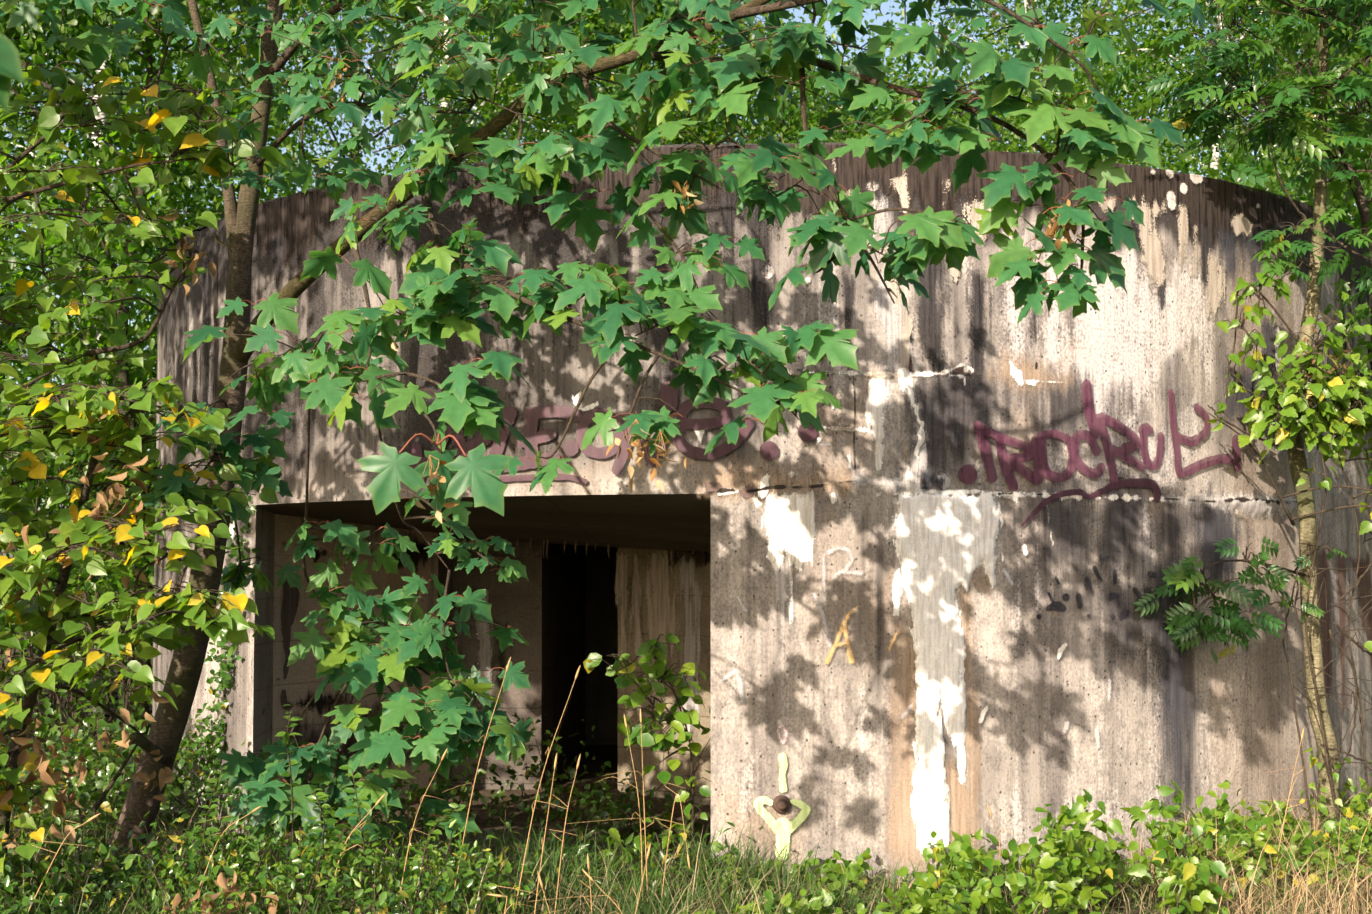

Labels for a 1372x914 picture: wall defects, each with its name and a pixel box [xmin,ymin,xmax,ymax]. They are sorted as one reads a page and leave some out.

leakage [1223,306,1282,424]
leakage [865,256,1009,854]
leakage [1023,485,1238,816]